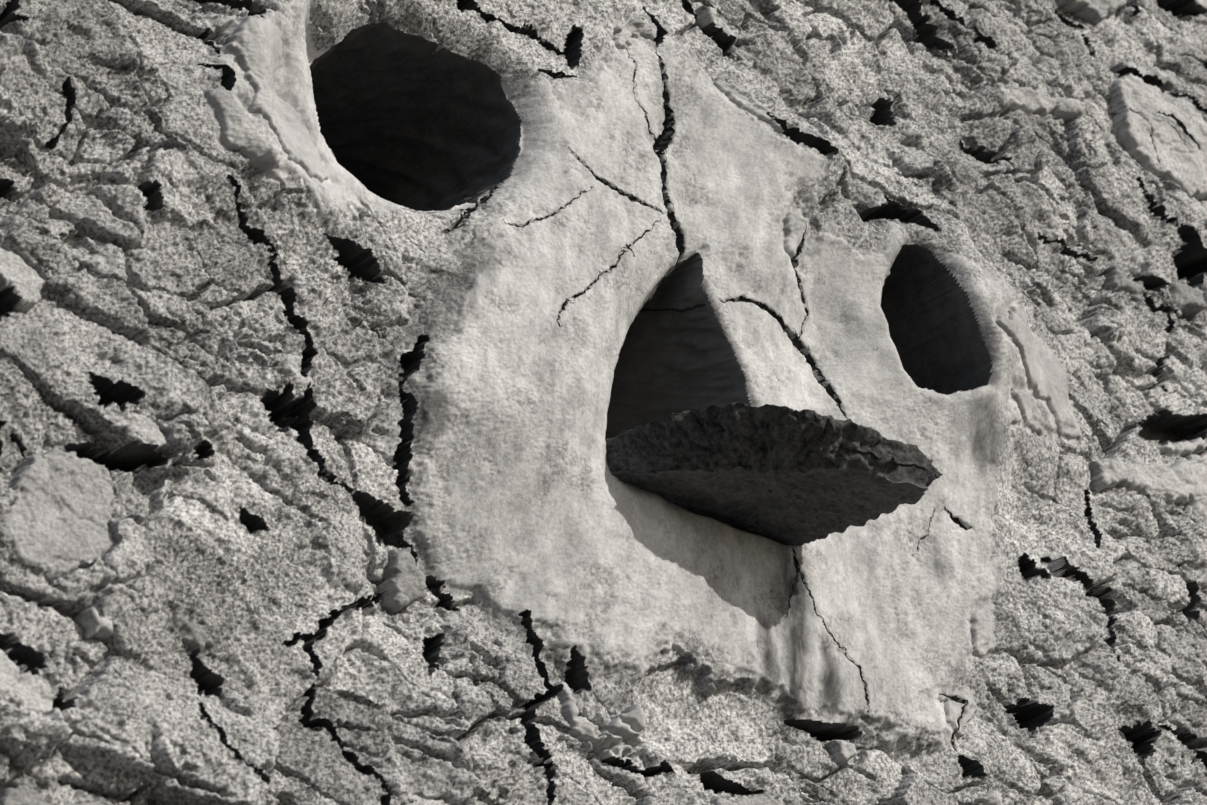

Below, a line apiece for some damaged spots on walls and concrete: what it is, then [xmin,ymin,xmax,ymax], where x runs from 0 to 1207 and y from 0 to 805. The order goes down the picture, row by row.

crack [441,0,723,327]
crack [640,224,847,418]
crack [388,334,460,612]
crack [282,590,393,805]
crack [510,609,564,805]
crack [784,547,870,717]